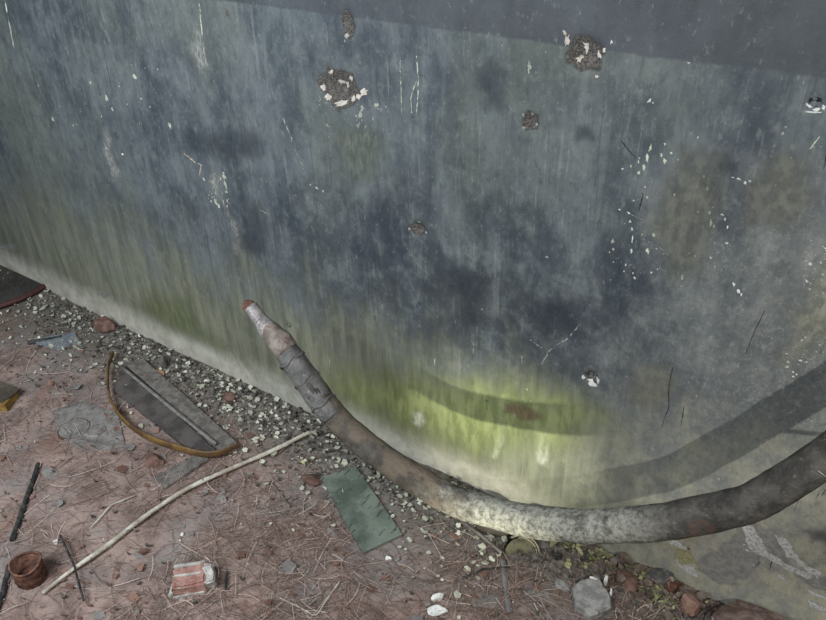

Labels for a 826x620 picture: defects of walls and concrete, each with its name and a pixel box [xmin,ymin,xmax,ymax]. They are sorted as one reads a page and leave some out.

spalling [563,30,613,78]
spalling [317,67,389,138]
spalling [522,111,539,131]